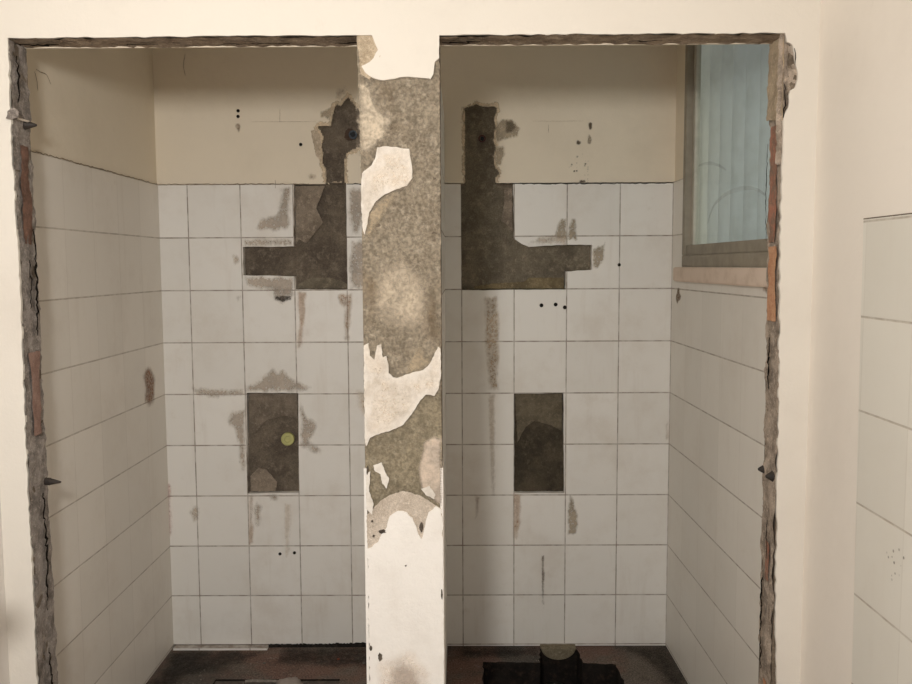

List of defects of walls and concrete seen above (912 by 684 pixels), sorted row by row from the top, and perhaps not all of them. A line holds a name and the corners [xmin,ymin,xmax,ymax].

flaking render [20,145,33,245]
spalling [311,129,322,161]
spalling [767,34,797,322]
spalling [357,35,443,548]
flaking render [28,351,42,436]
peeling [248,393,299,492]
peeling [514,393,564,492]